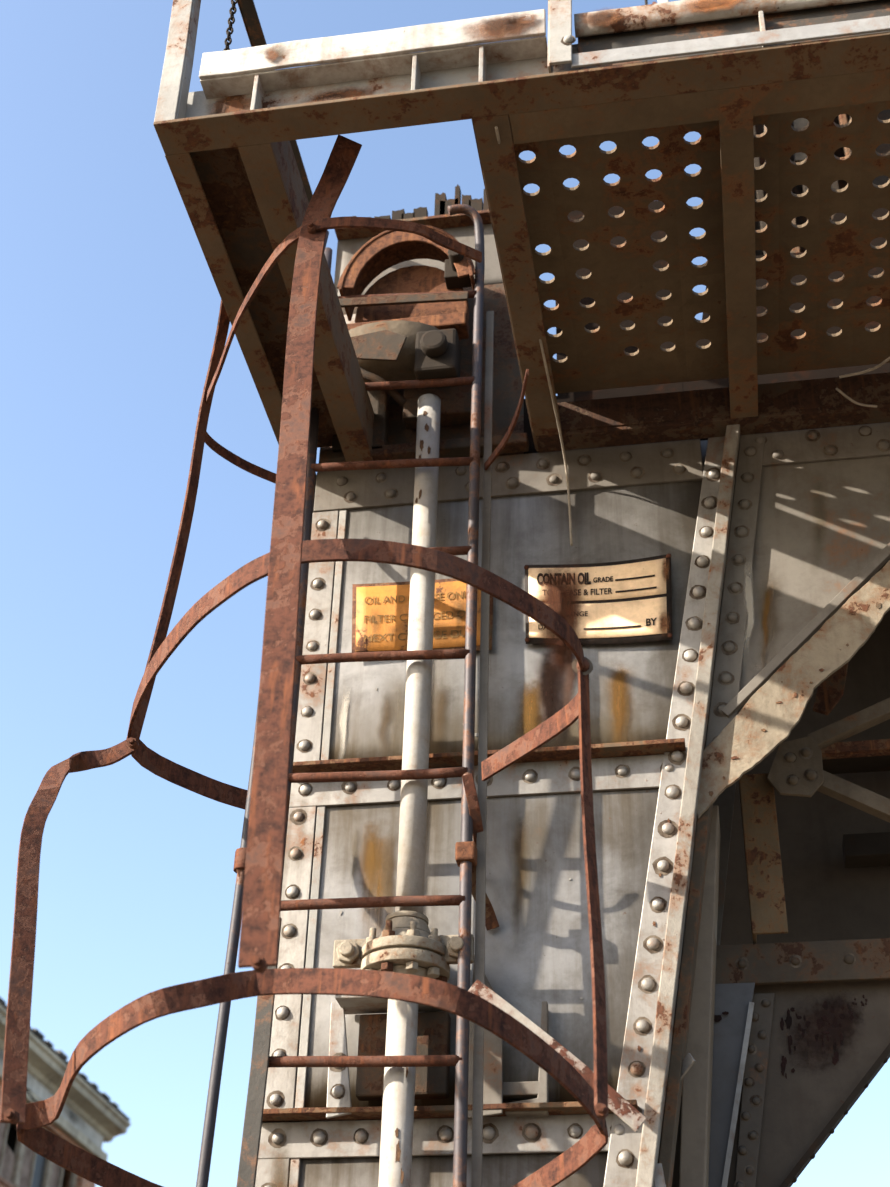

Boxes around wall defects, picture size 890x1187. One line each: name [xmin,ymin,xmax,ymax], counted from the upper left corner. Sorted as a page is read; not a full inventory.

corrosion [585,10,620,25]
corrosion [689,0,743,11]
corrosion [523,629,575,733]
corrosion [612,670,629,735]